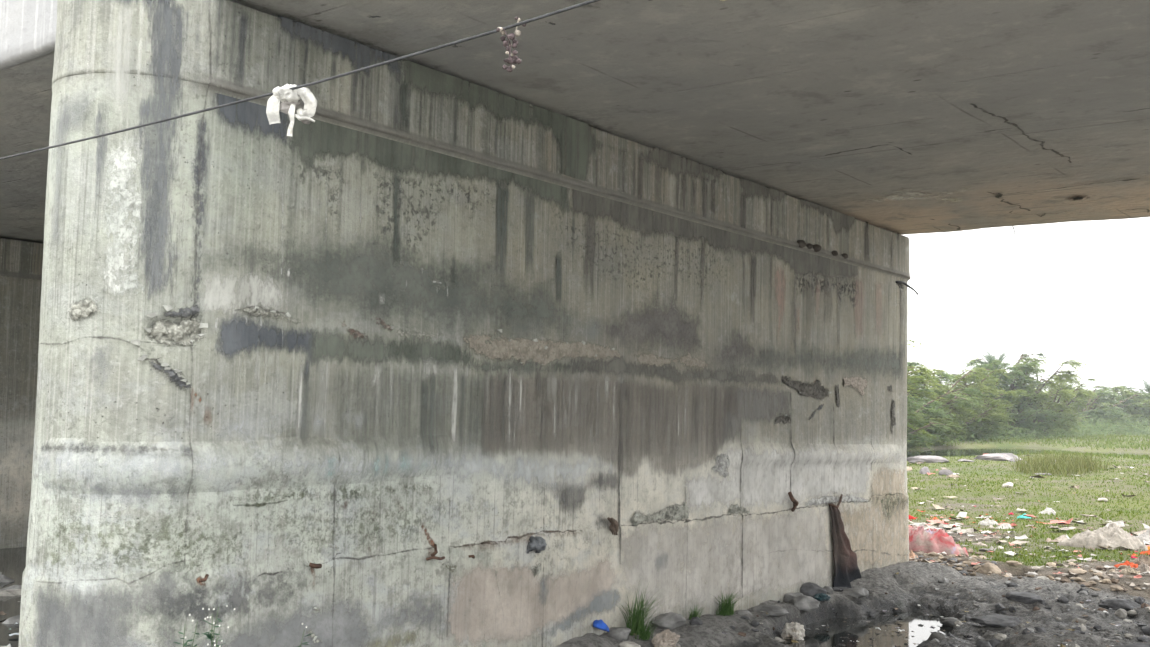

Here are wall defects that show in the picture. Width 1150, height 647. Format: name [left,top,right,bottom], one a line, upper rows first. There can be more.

crack [971,104,1136,217]
leakage [193,15,902,510]
crack [41,336,193,404]
spalling [130,305,208,389]
spalling [782,375,868,420]
crack [244,496,286,507]
rust [421,525,445,561]
spalling [630,502,689,526]
crack [618,431,810,598]